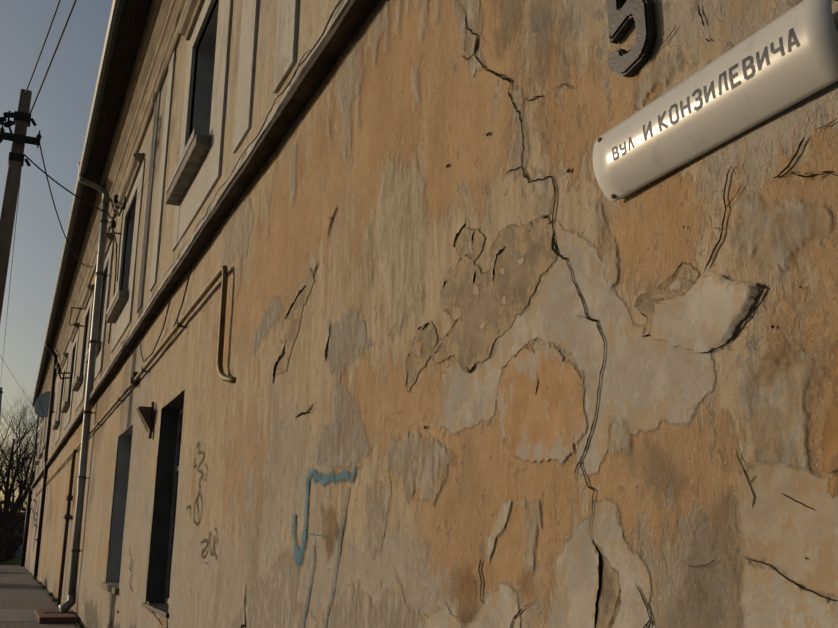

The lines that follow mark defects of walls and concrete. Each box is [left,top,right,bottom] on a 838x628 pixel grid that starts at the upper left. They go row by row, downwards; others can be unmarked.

crack [773,118,838,180]
crack [704,165,741,272]
crack [461,6,651,628]
flaking render [406,87,716,475]
flaking render [385,431,455,505]
flaking render [731,348,838,628]
crack [745,557,838,601]